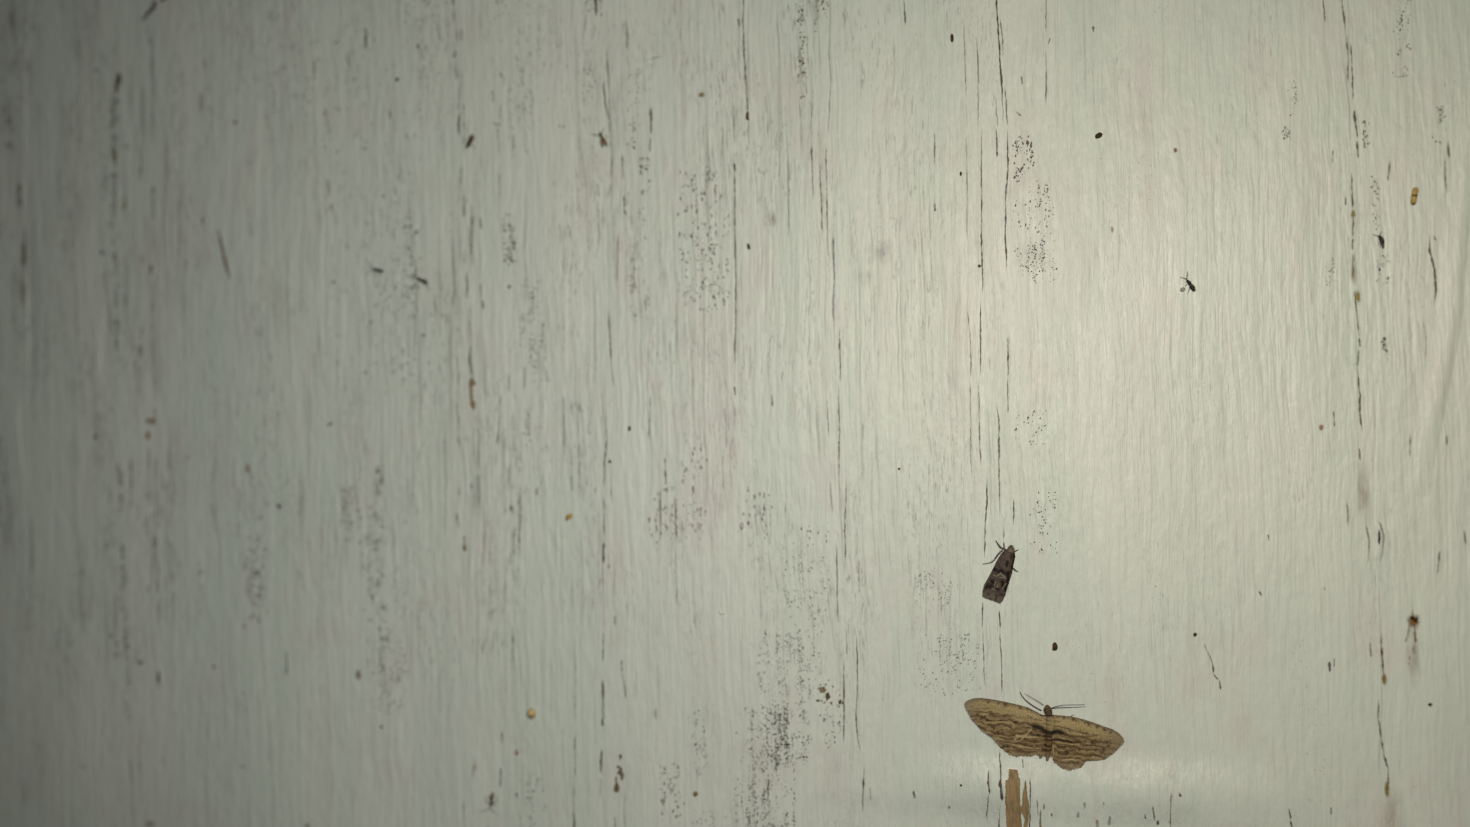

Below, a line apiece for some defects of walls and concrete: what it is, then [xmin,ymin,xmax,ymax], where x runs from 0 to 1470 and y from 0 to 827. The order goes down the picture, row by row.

peeling [795,0,827,98]
peeling [1005,769,1042,827]